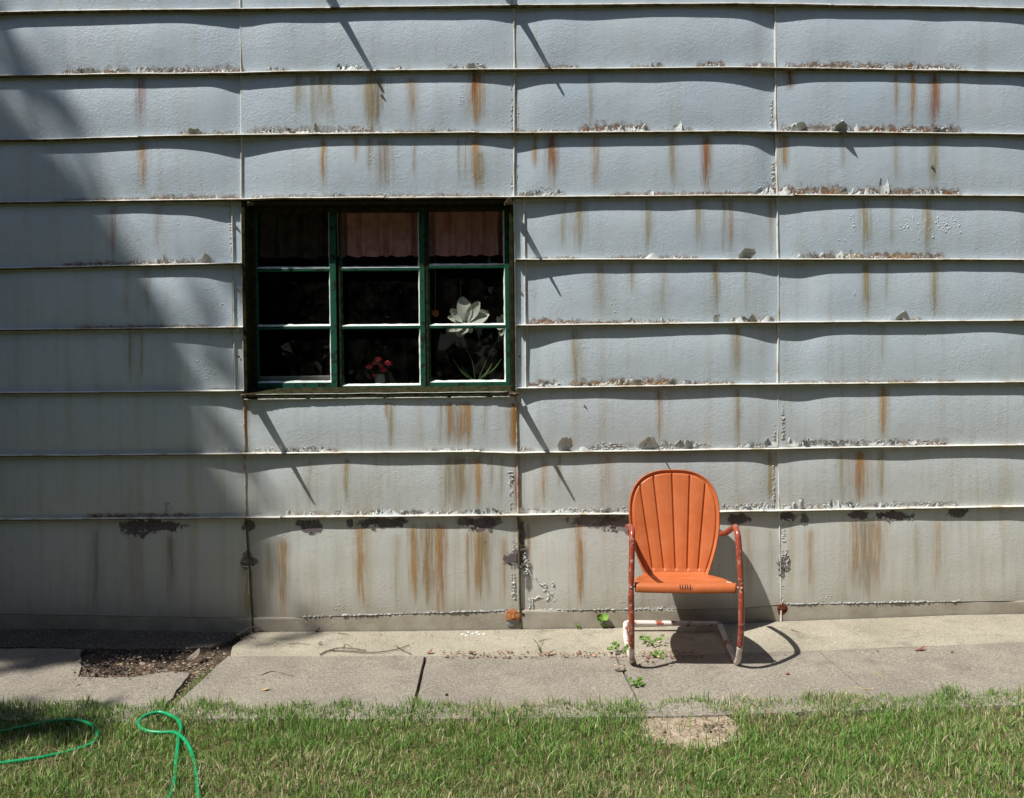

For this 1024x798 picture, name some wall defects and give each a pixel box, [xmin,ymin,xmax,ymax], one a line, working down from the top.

rust [472,74,481,120]
peeling [770,99,962,133]
rust [473,138,483,182]
peeling [614,162,961,195]
peeling [797,248,943,259]
peeling [736,405,947,448]
peeling [86,513,199,539]
peeling [240,550,259,570]
rust [411,527,442,589]
peeling [285,471,702,617]
peeling [720,460,969,604]